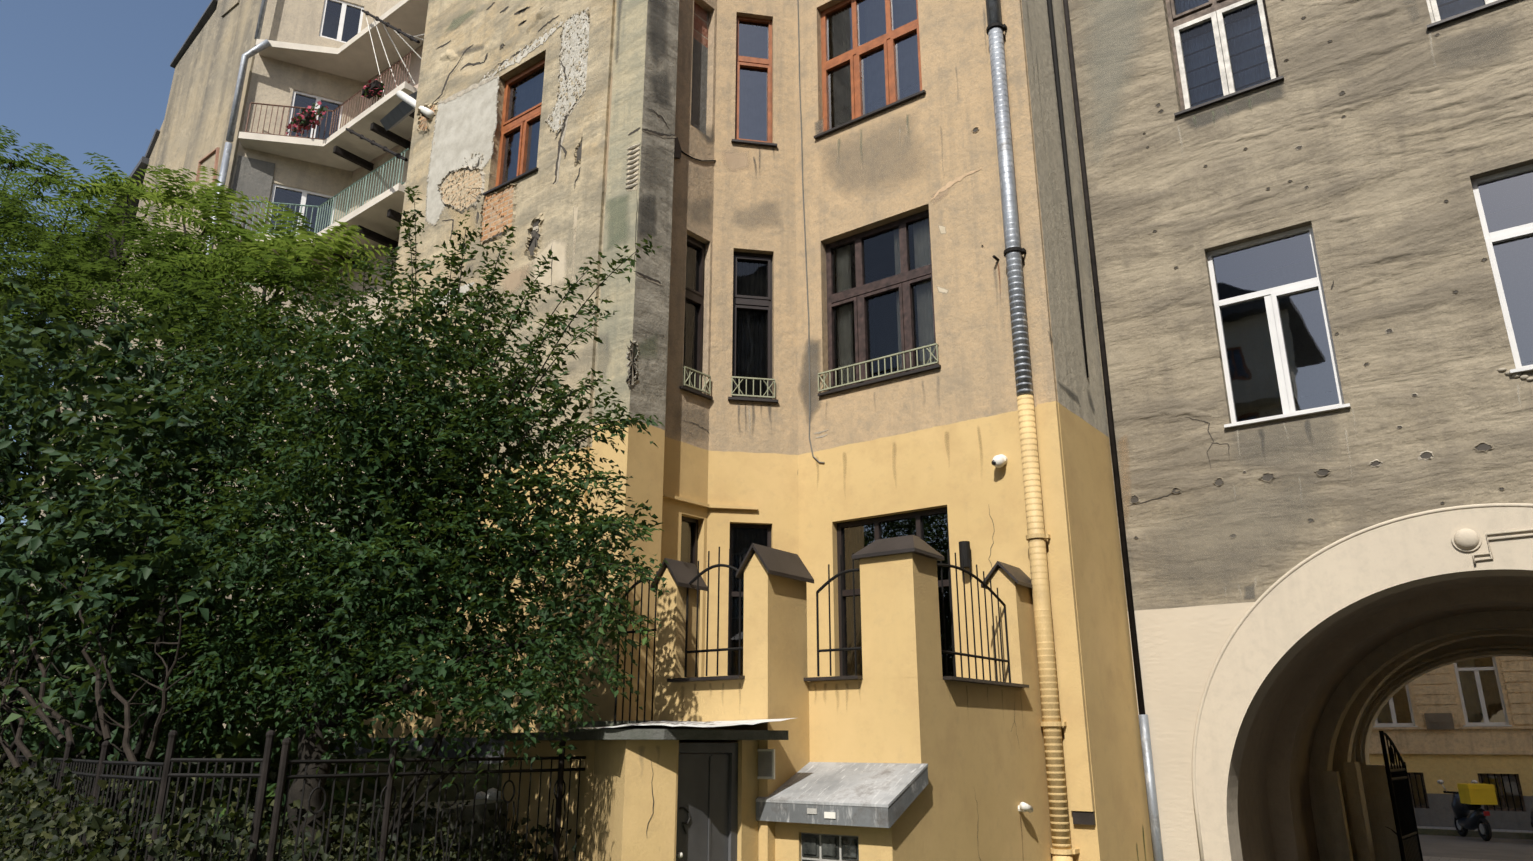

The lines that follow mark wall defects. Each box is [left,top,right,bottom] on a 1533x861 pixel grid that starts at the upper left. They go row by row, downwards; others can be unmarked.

peeling [417,7,590,261]